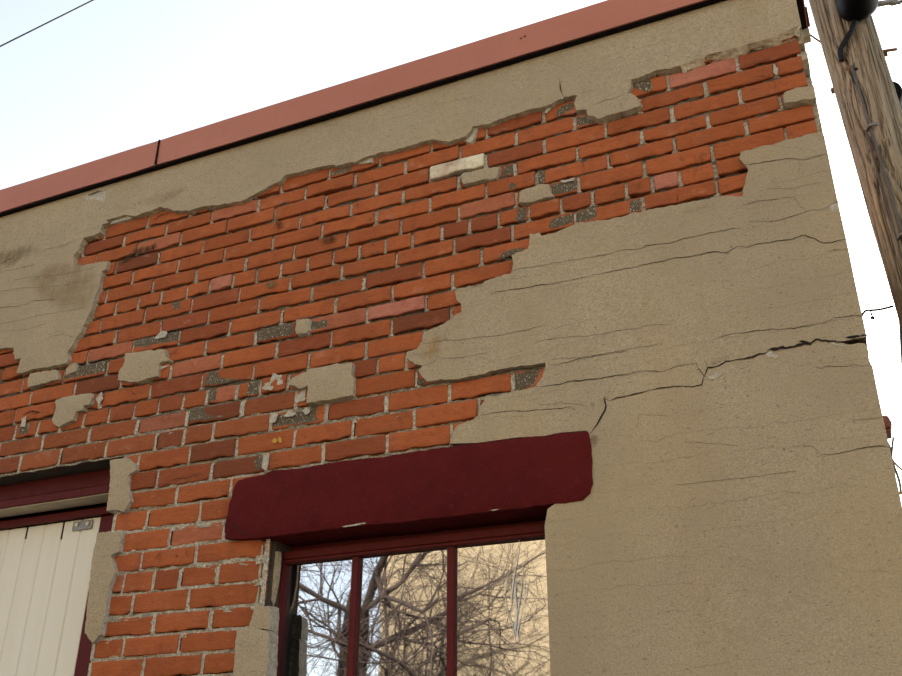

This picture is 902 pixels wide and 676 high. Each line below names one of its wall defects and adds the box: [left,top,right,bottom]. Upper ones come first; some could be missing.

crack [491,154,845,294]
crack [424,315,867,432]
peeling [184,401,271,445]
peeling [388,366,545,453]
peeling [20,449,61,473]
peeling [106,458,142,515]
peeling [147,504,200,527]
peeling [170,522,223,546]
peeling [85,529,170,644]
peeling [189,583,258,609]
peeling [212,551,281,633]
peeling [179,627,278,676]